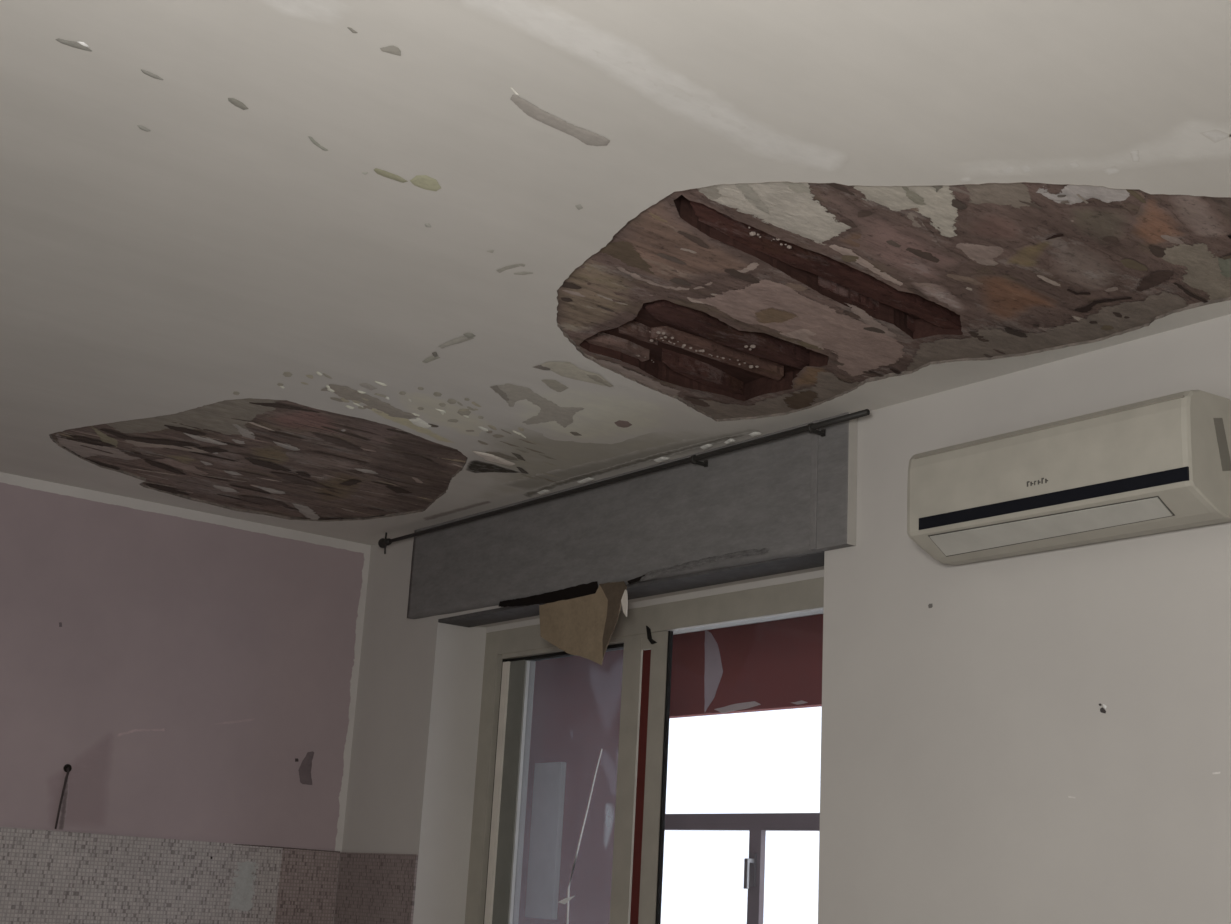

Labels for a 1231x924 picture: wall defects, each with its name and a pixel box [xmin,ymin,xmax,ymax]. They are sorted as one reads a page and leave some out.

peeling [55,38,92,52]
peeling [380,46,401,56]
peeling [228,98,248,110]
peeling [510,88,610,146]
peeling [362,168,441,191]
peeling [277,362,613,445]
peeling [184,422,320,520]
spalling [522,428,767,499]